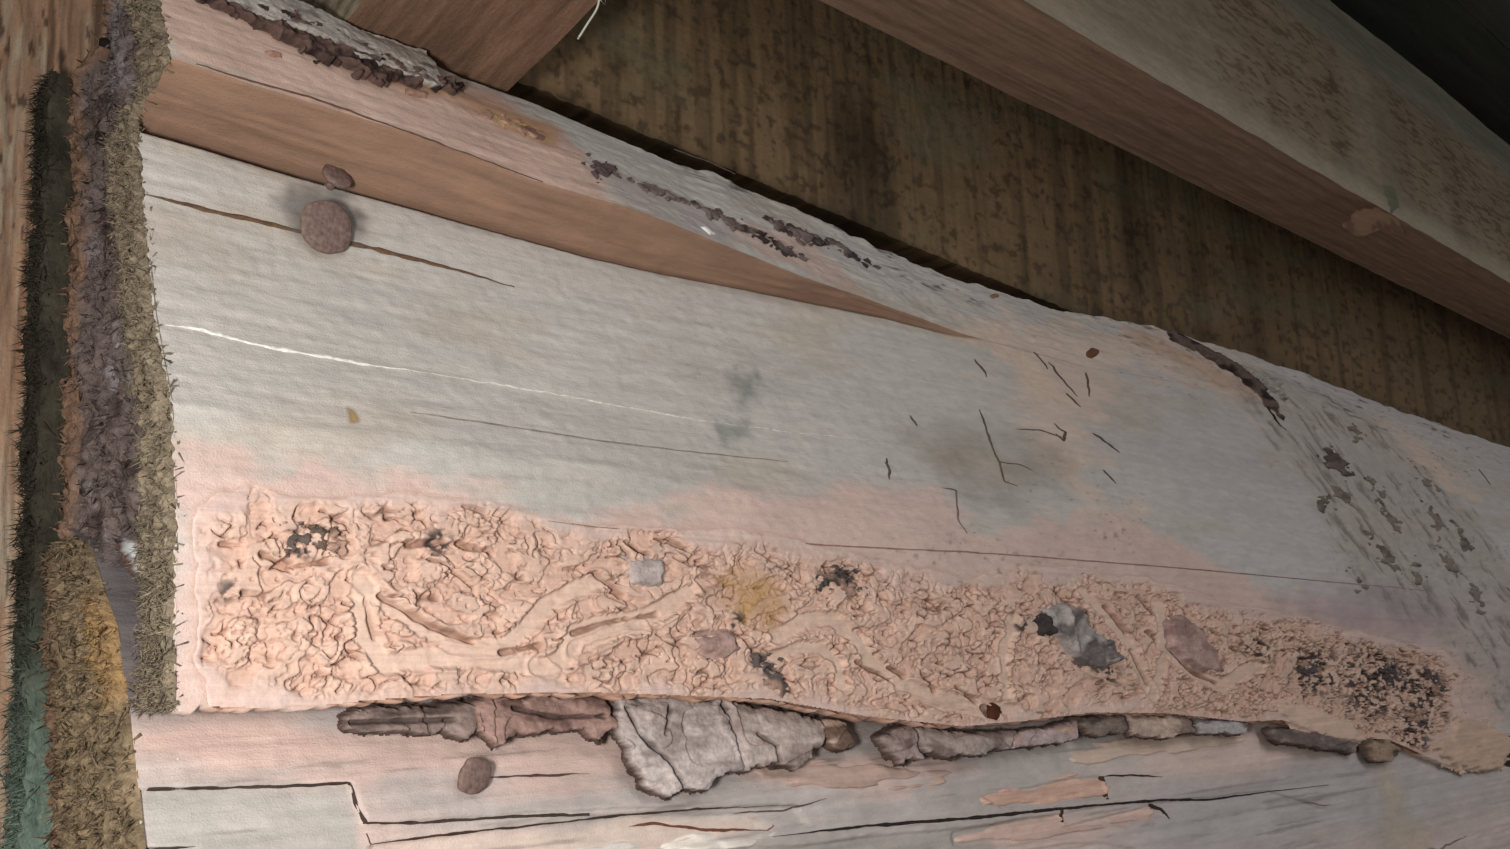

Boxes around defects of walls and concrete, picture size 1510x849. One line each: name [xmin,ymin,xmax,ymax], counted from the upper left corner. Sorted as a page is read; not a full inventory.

crack [144,194,301,234]
crack [349,241,515,287]
peeling [1264,699,1367,744]
peeling [1428,712,1510,775]
crack [493,771,589,779]
crack [147,774,1331,845]
crack [146,841,195,849]